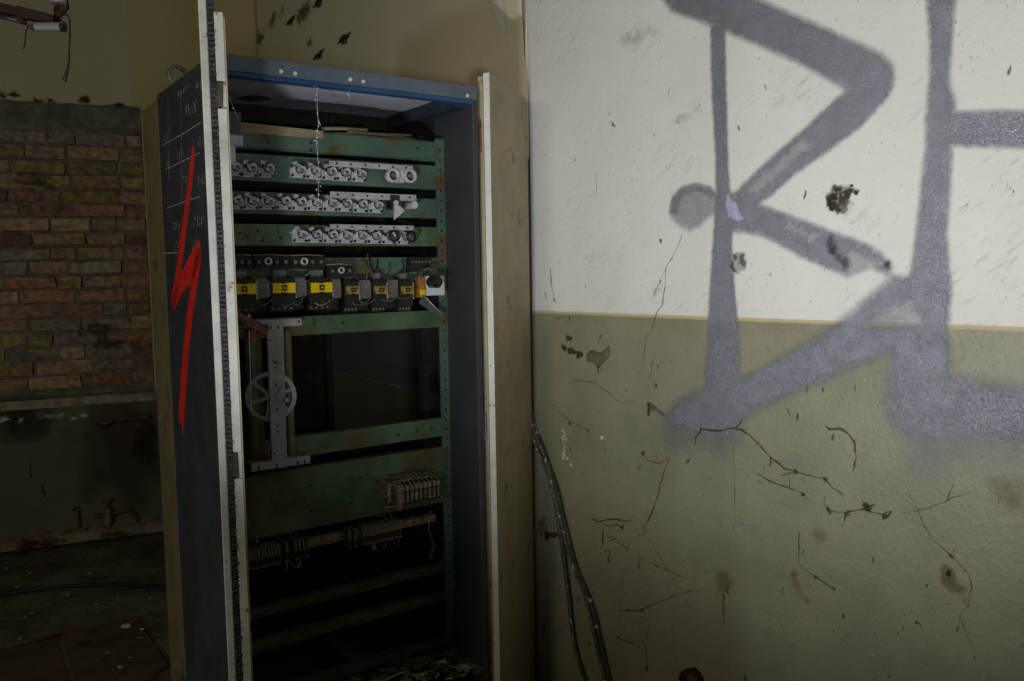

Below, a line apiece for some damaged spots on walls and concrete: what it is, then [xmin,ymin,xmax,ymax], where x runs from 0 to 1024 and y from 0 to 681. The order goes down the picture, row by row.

spalling [826,184,858,213]
peeling [561,335,610,368]
crack [592,417,975,671]